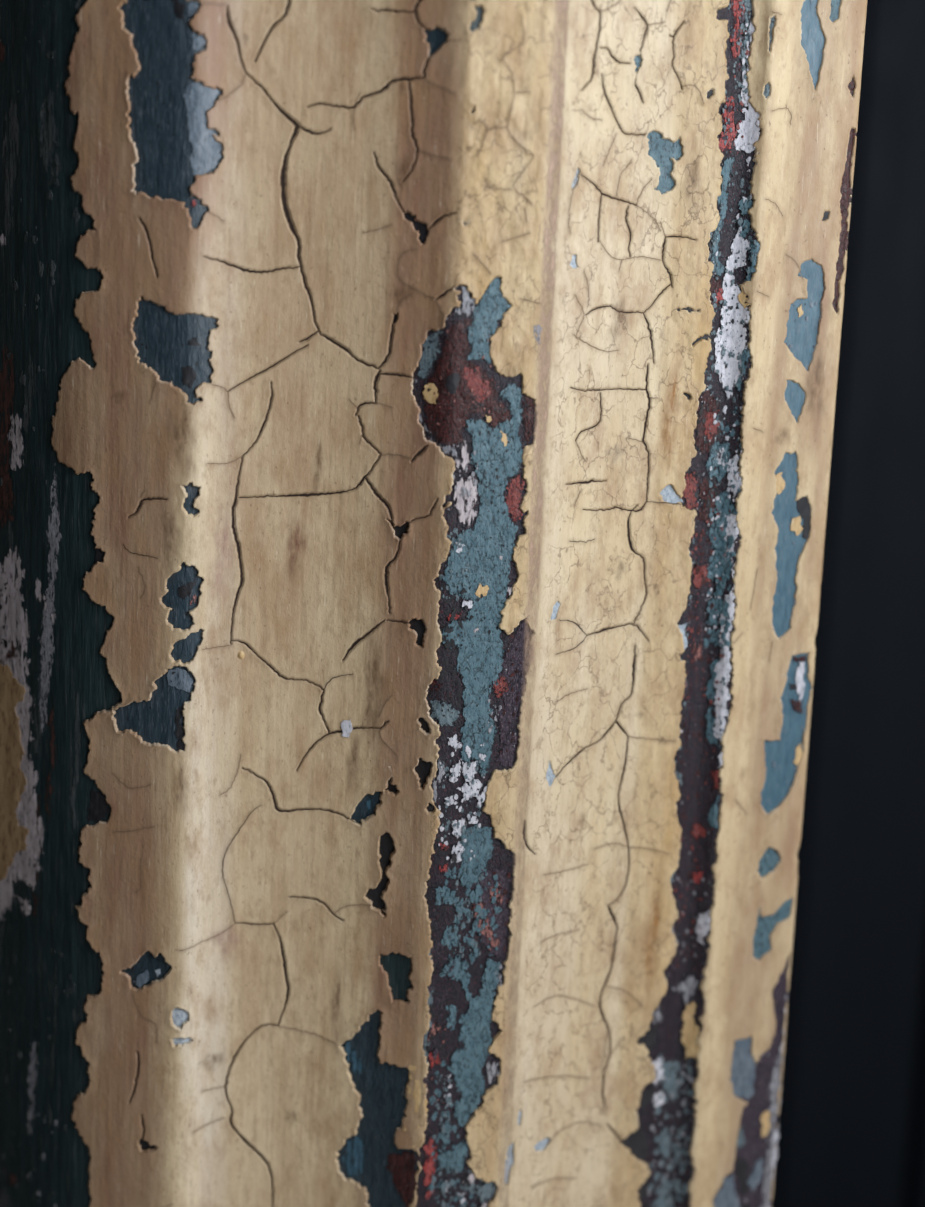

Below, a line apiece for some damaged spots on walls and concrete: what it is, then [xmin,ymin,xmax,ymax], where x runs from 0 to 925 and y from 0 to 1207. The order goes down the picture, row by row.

peeling [0,0,203,1207]
crack [123,492,167,599]
crack [139,218,157,277]
peeling [120,0,223,228]
peeling [133,298,218,404]
crack [202,0,534,771]
peeling [337,0,580,1207]
crack [523,0,704,1144]
peeling [620,0,775,1207]
peeling [772,452,811,638]
crack [129,994,157,1141]
crack [180,755,370,1207]